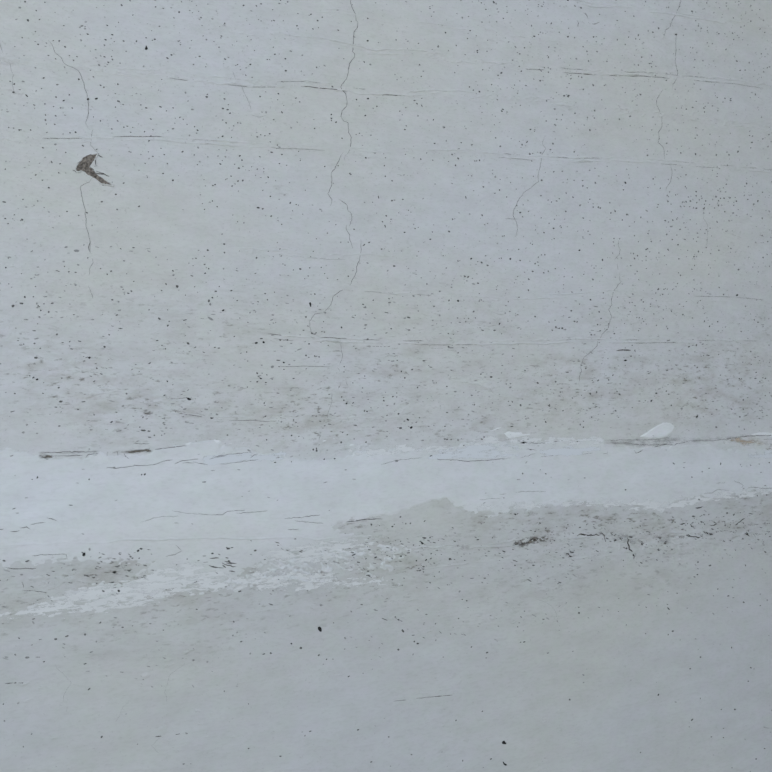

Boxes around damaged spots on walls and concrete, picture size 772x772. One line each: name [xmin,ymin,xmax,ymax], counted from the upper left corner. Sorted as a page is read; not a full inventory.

spalling [73,152,115,187]
leakage [0,535,401,623]